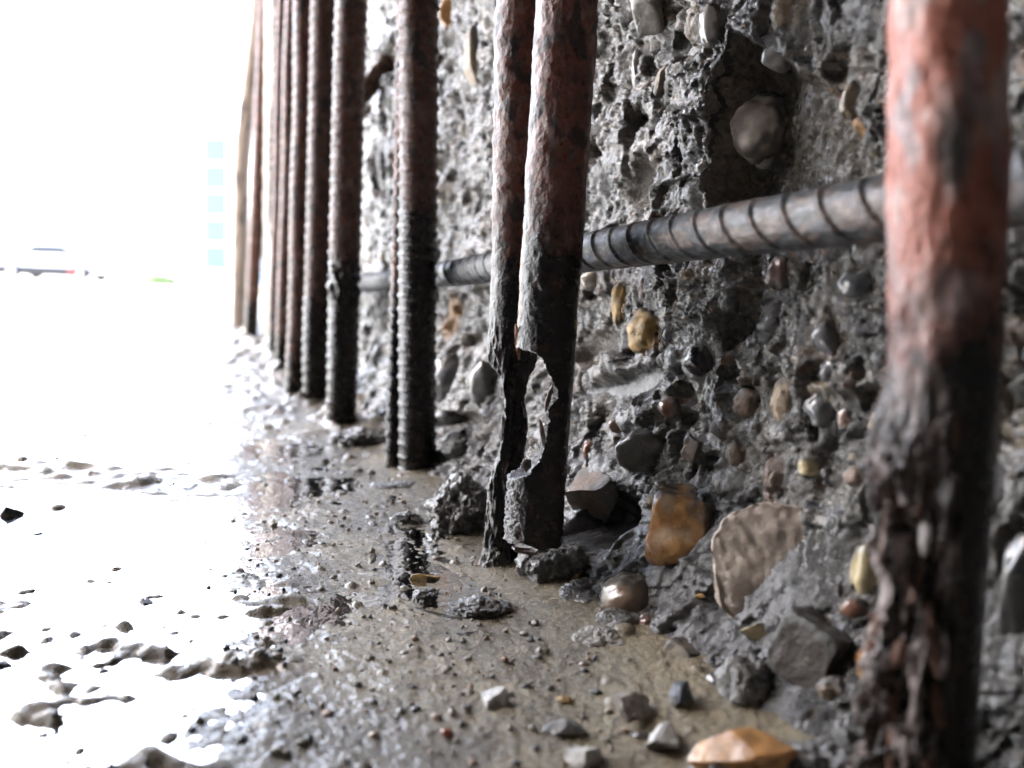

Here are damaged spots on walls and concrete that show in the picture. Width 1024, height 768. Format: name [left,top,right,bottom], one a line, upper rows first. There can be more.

spalling [231,0,1024,768]